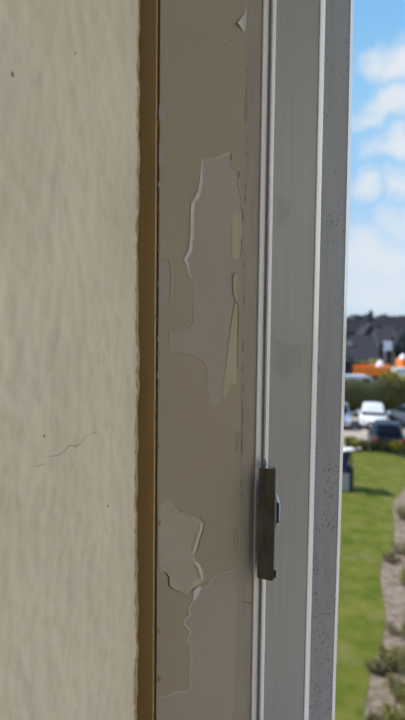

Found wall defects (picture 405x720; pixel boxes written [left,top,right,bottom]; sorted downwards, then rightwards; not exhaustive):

peeling [168,152,243,406]
peeling [158,499,237,720]